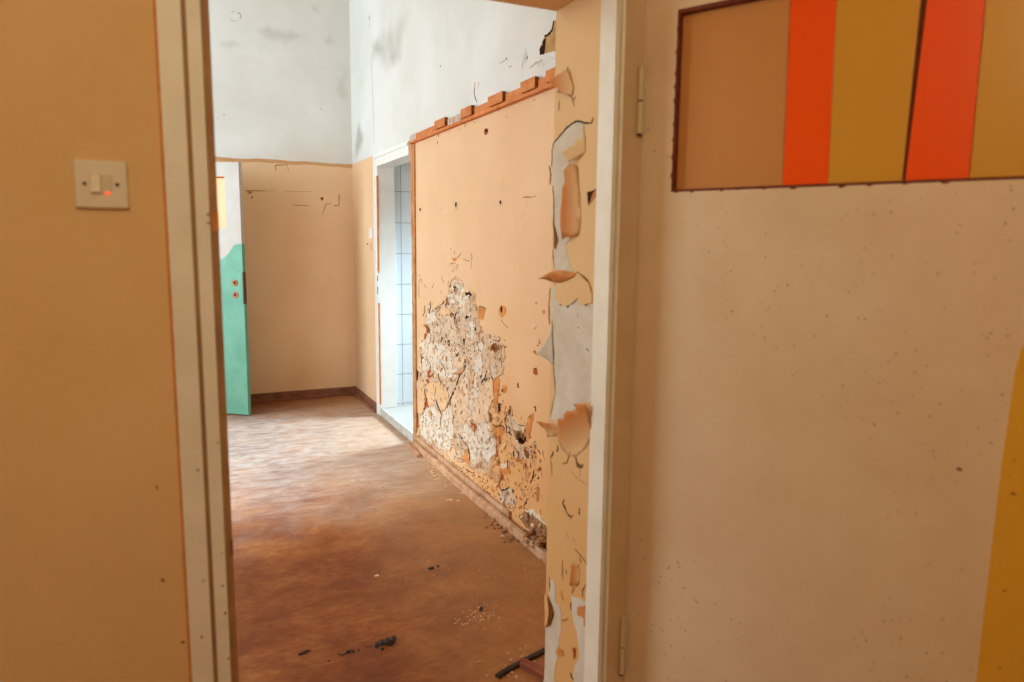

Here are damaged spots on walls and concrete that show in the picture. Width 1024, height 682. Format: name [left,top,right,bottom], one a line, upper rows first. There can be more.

spalling [539,20,556,59]
peeling [549,67,576,111]
peeling [533,117,593,423]
peeling [416,275,547,538]
peeling [543,577,586,682]